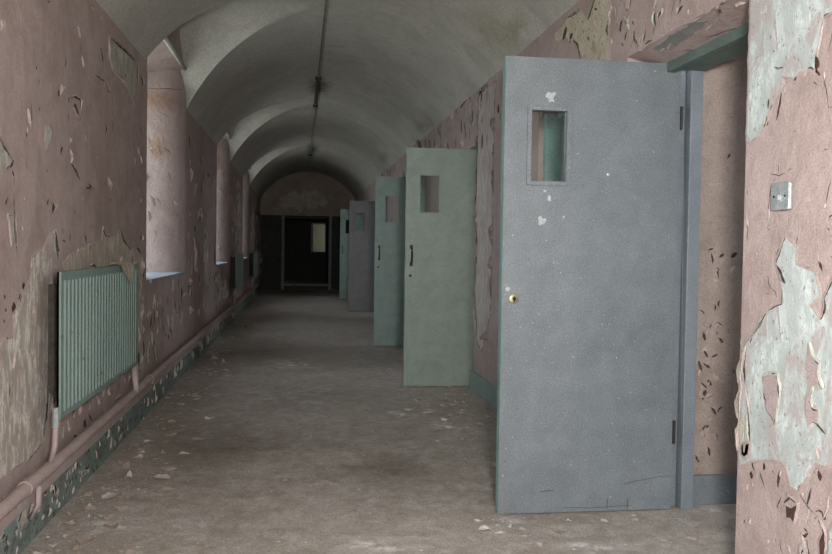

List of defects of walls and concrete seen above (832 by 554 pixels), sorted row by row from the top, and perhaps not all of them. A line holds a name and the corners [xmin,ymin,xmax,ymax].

peeling [554,0,832,144]
peeling [413,71,503,353]
spalling [0,228,121,483]
peeling [0,415,145,554]
peeling [730,234,832,554]